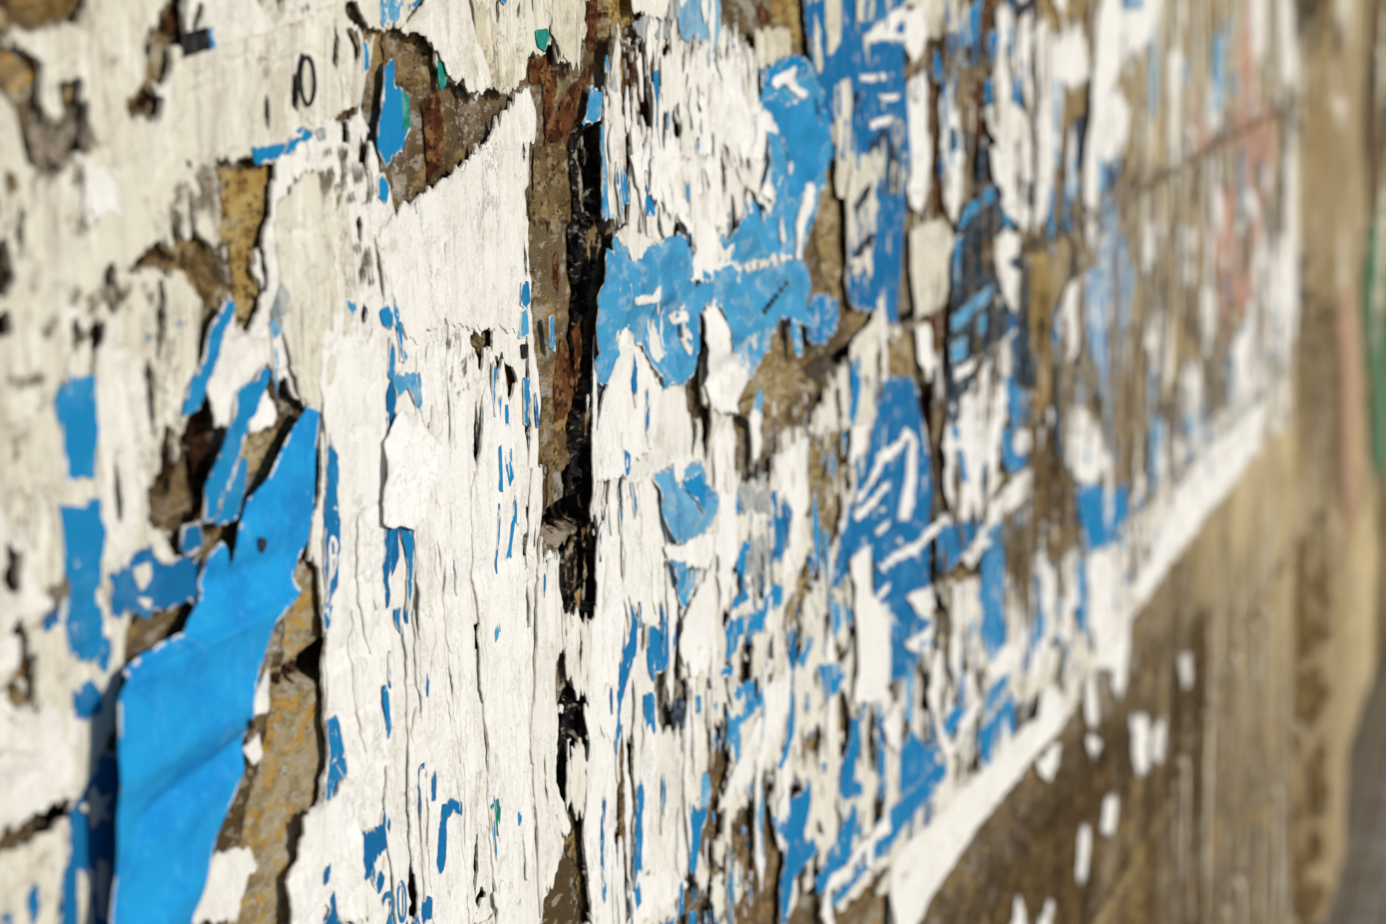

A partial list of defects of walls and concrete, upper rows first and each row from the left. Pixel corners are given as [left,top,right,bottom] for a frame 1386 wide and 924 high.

spalling [587,9,647,126]
spalling [815,159,843,310]
spalling [239,428,276,514]
crack [523,122,601,812]
spalling [732,334,817,481]
spalling [784,431,847,626]
spalling [876,328,916,381]
spalling [216,556,325,924]
spalling [616,743,631,878]
spalling [654,661,687,730]
spalling [700,725,781,924]
spalling [824,867,884,924]